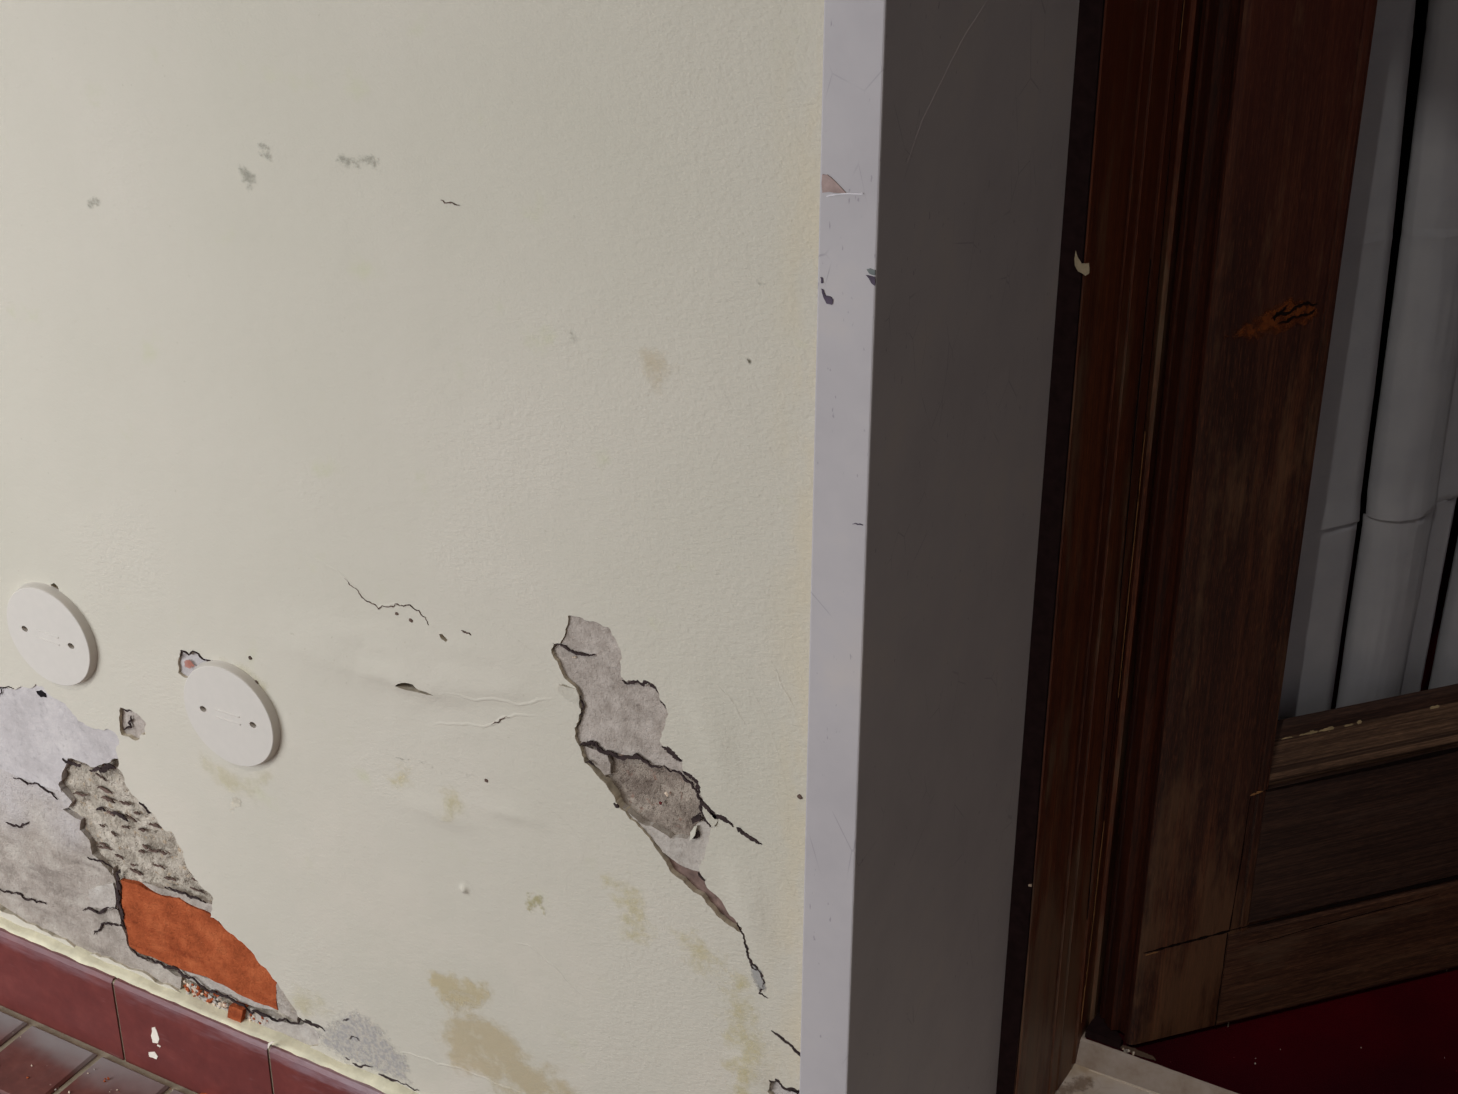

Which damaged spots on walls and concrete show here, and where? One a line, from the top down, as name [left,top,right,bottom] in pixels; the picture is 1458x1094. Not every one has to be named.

crack [348,582,471,636]
flaking render [180,650,211,676]
flaking render [553,615,718,881]
flaking render [0,685,419,1091]
flaking render [769,1078,800,1094]